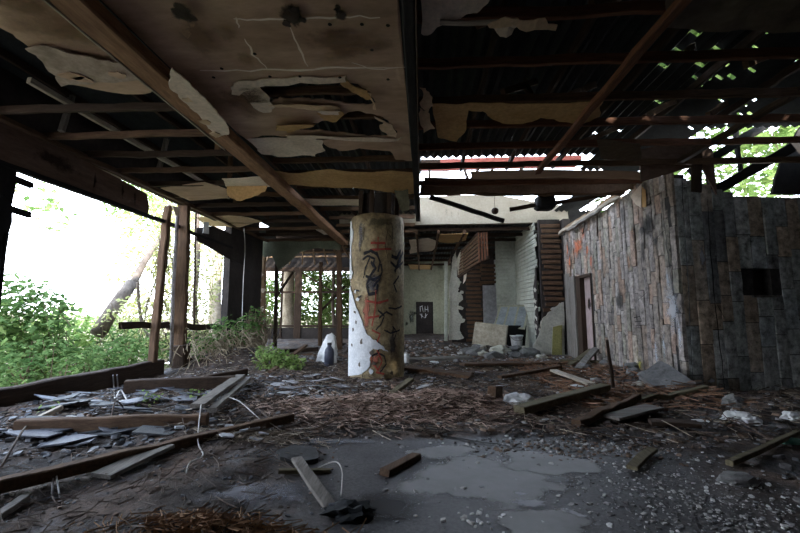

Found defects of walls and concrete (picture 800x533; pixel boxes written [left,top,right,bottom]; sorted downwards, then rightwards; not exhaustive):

peeling [25,45,138,87]
damp [280,4,306,27]
crack [200,15,405,72]
peeling [494,26,516,38]
peeling [231,75,403,142]
peeling [348,221,388,377]
flaking render [448,252,465,340]
flaking render [533,267,565,355]